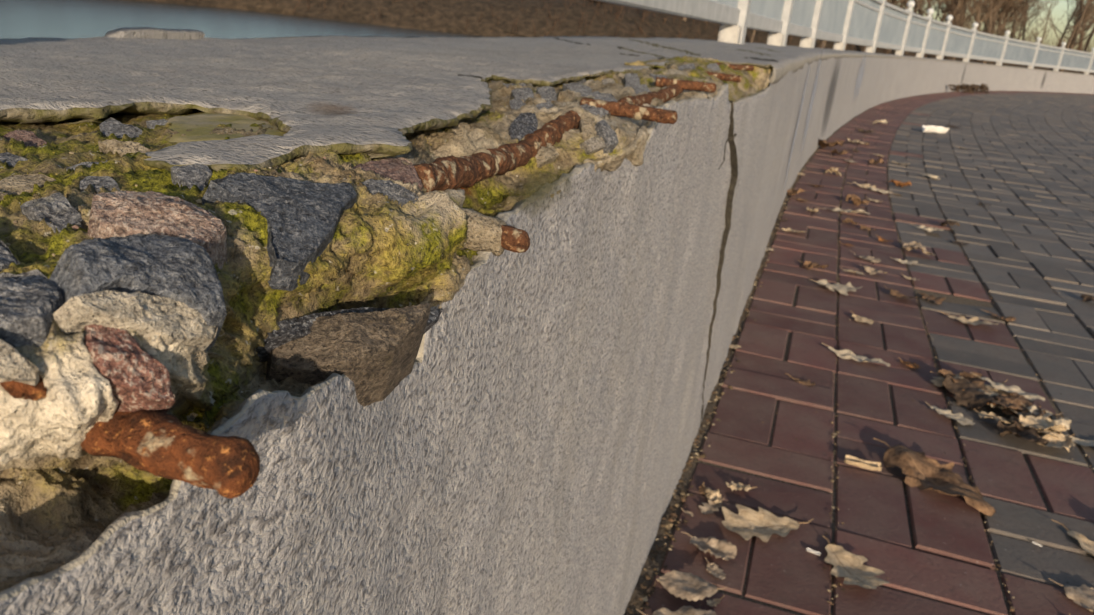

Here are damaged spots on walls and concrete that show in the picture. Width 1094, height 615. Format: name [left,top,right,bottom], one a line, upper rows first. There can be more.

spalling [0,56,773,592]
crack [700,100,738,427]